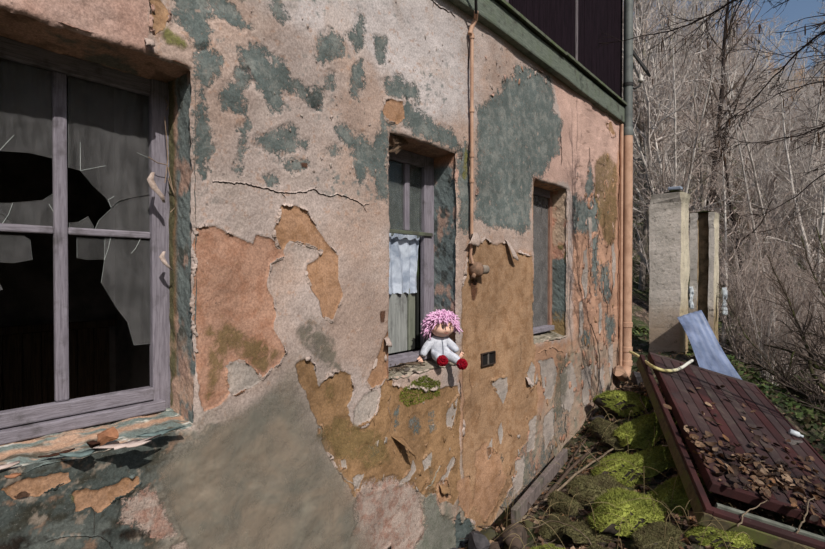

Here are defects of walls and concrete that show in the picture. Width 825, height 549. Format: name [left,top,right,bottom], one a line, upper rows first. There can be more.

crack [212,180,370,212]
peeling [144,0,616,549]
peeling [38,426,185,458]
peeling [0,460,71,500]
peeling [72,474,189,549]